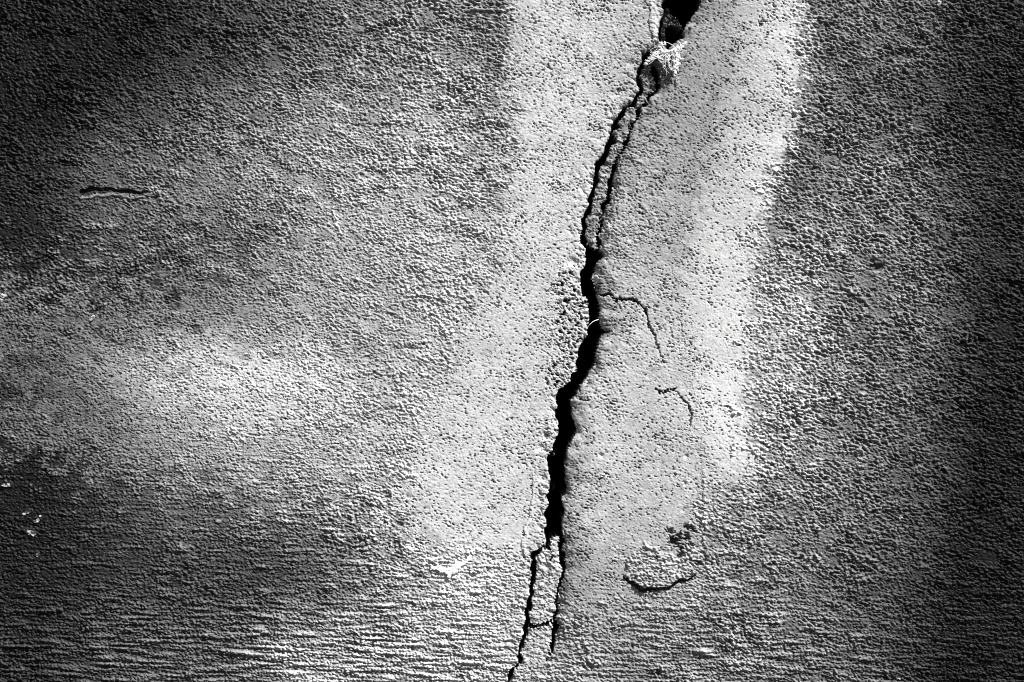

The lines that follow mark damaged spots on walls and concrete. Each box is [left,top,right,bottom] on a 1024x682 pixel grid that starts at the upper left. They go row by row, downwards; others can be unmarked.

crack [505,0,701,682]